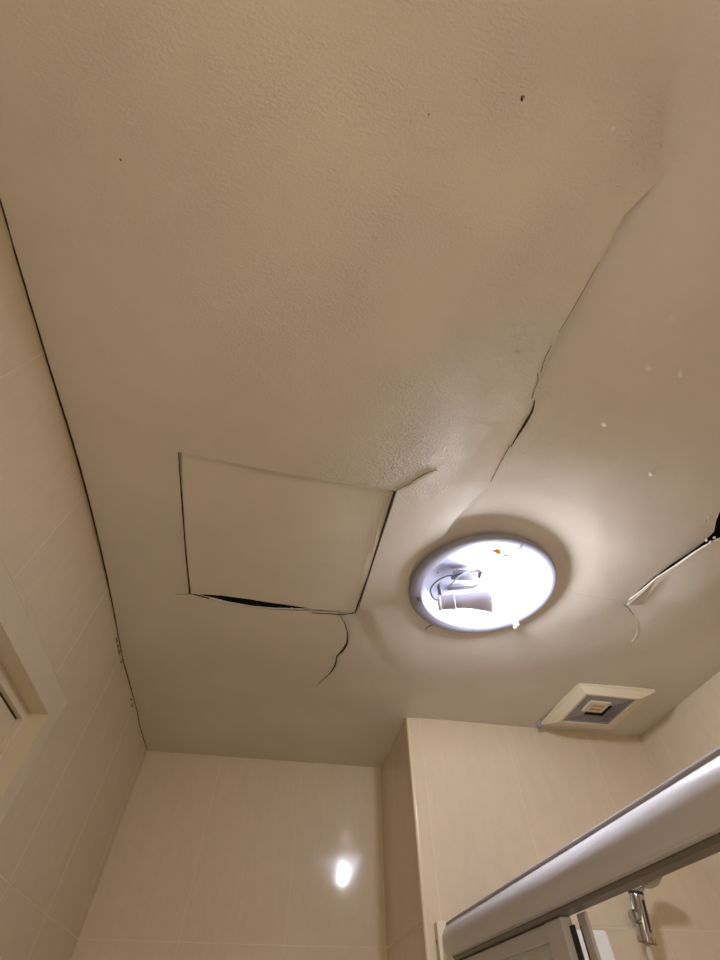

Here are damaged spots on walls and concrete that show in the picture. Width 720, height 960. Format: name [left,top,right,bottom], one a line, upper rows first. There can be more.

crack [491,262,599,481]
crack [178,452,437,680]
crack [576,512,720,642]